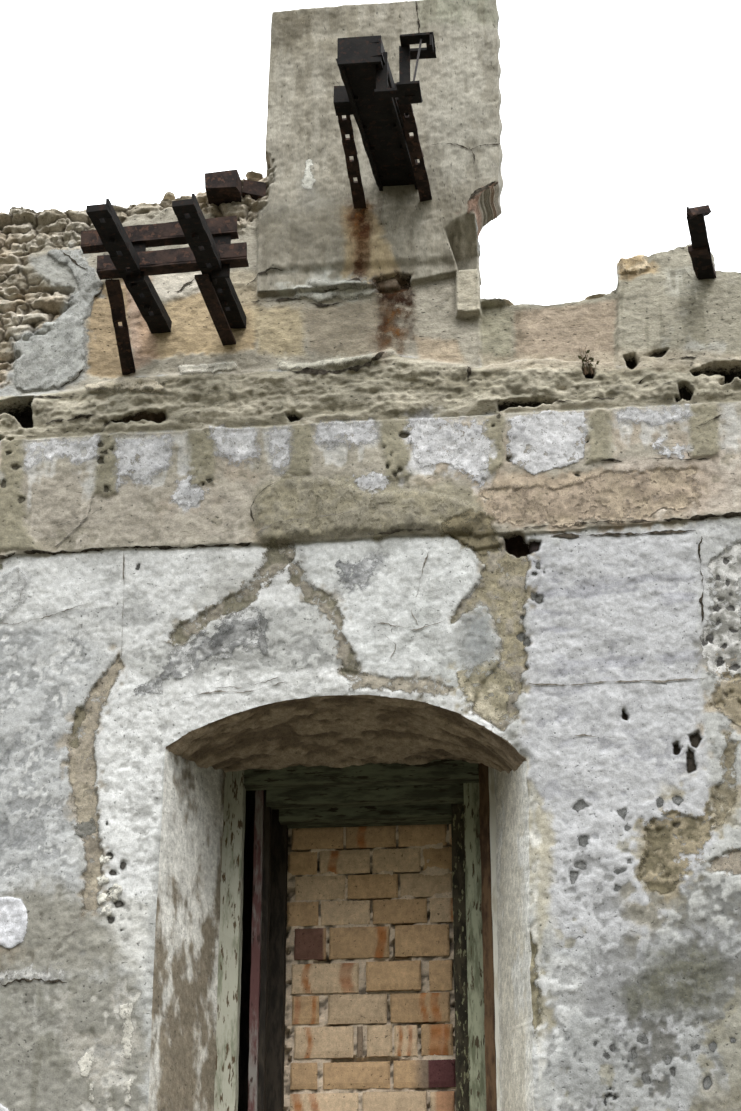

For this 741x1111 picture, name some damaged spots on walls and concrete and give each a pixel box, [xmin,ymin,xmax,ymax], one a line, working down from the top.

spalling [467,181,498,214]
corrosion [347,205,370,273]
flaking render [12,249,164,394]
corrosion [371,283,414,343]
crack [0,494,252,657]
crack [363,528,440,657]
flaking render [134,366,741,731]
crack [529,678,706,686]
flaking render [614,538,741,894]
flaking render [573,800,589,812]
flaking render [570,861,586,884]
crack [0,929,80,987]